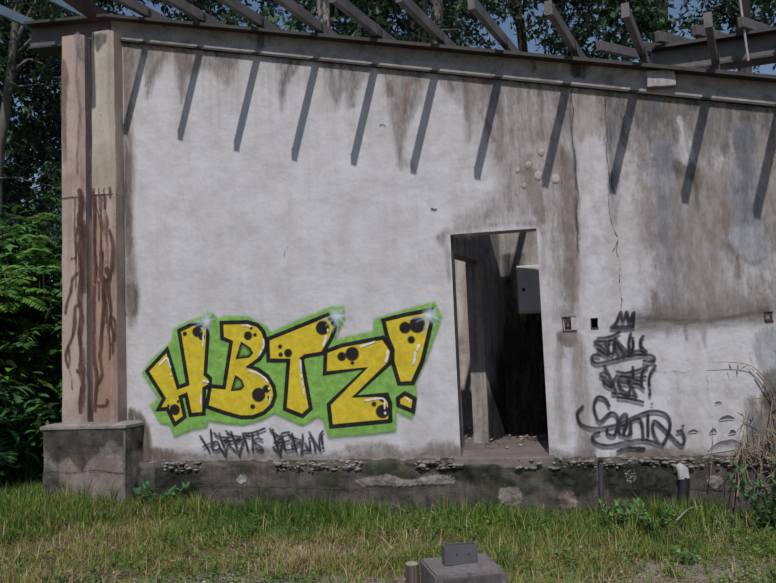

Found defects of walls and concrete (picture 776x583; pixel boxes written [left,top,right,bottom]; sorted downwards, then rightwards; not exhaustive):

corrosion [93,197,109,294]
damp [480,78,776,328]
damp [488,252,548,441]
spalling [163,461,202,472]
spalling [273,459,464,487]
spalling [514,415,776,488]
damp [713,370,776,456]